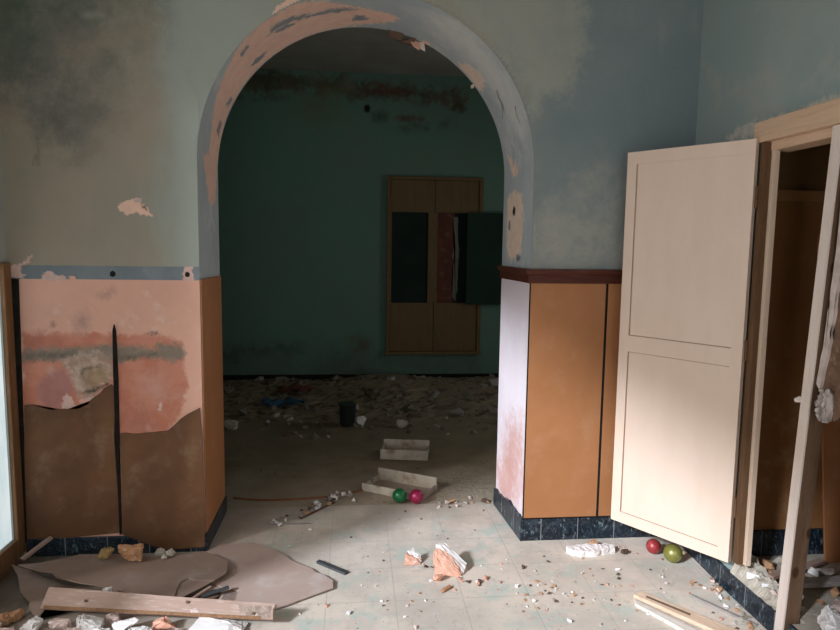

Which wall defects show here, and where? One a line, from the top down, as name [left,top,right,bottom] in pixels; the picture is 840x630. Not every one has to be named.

water stain [232,68,482,142]
peeling [50,0,653,270]
peeling [7,250,76,285]
peeling [178,262,198,285]
water stain [20,318,78,344]
water stain [22,369,38,414]
water stain [95,321,200,434]